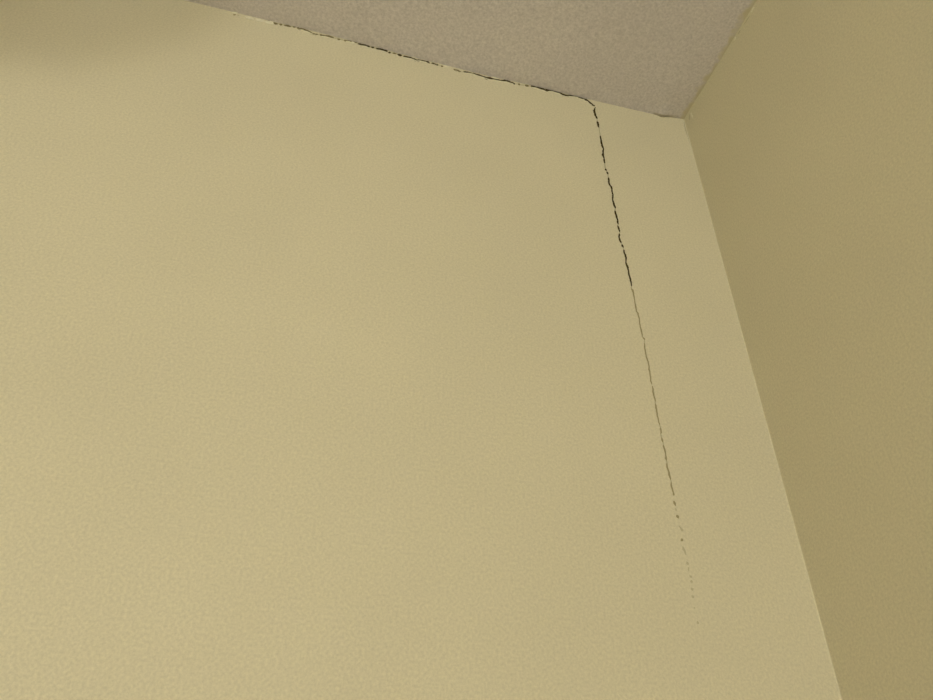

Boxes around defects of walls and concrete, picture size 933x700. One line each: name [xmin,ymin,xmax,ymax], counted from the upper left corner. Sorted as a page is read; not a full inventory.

crack [232,11,699,624]